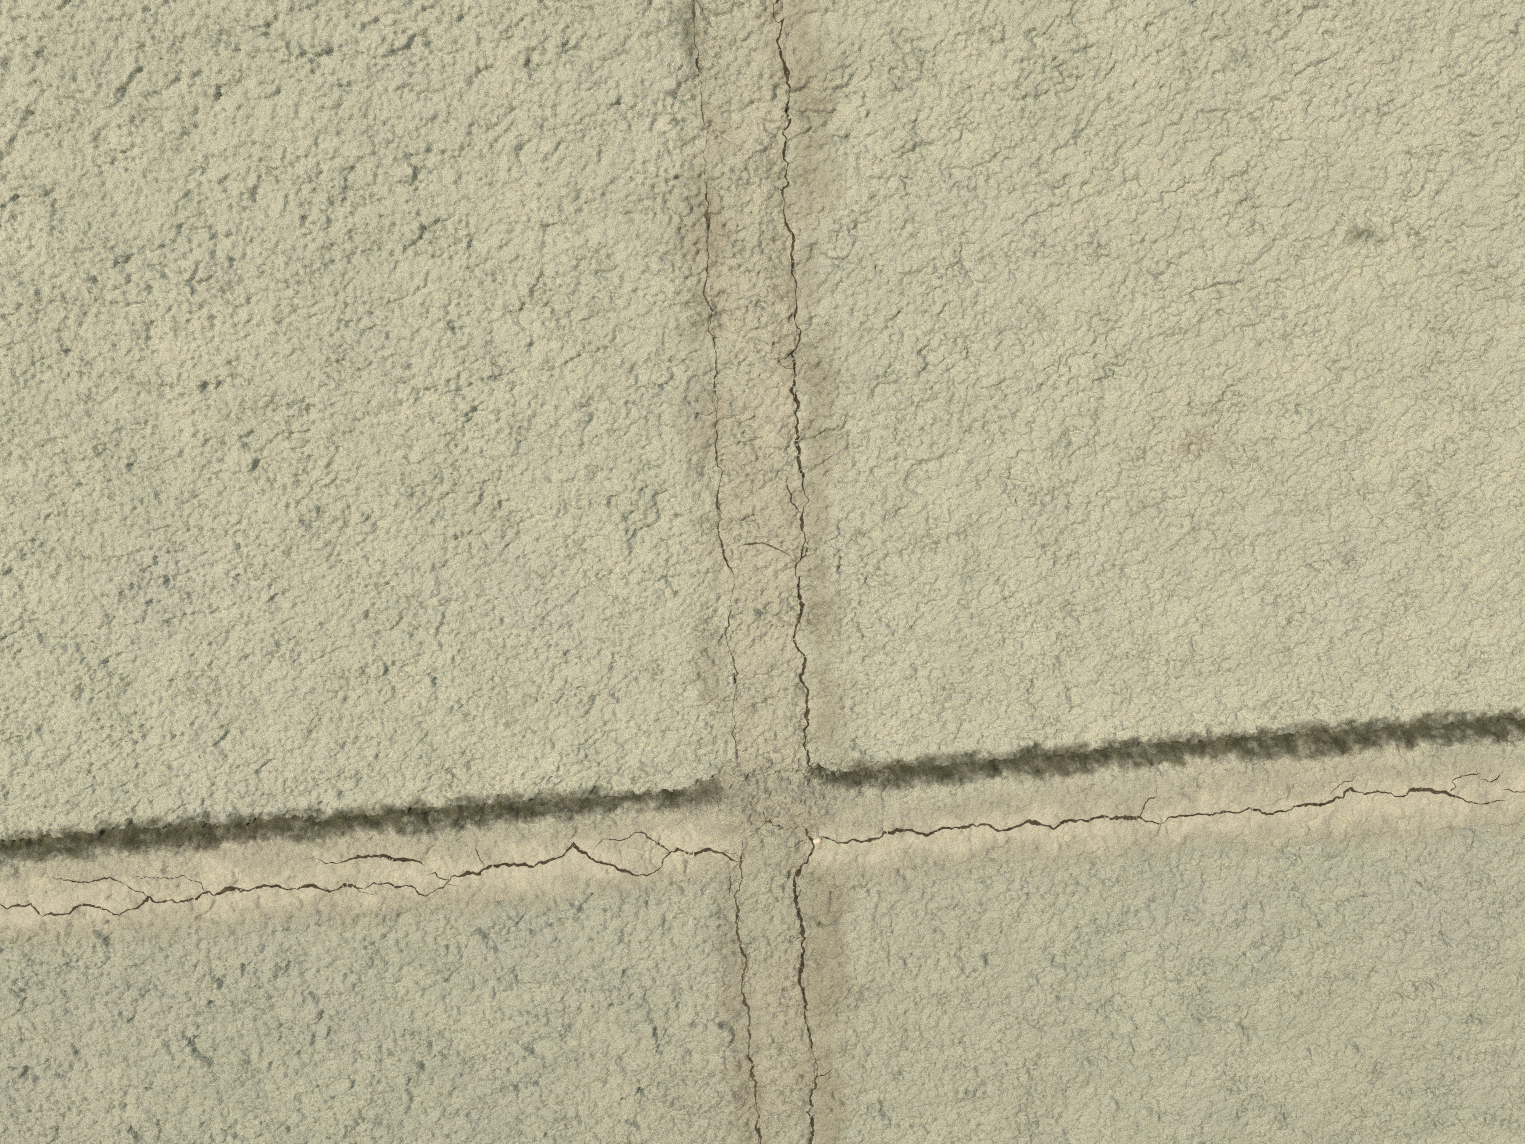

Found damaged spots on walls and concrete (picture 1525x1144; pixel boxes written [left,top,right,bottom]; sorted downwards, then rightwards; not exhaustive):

crack [692,0,828,801]
crack [0,774,1525,1144]